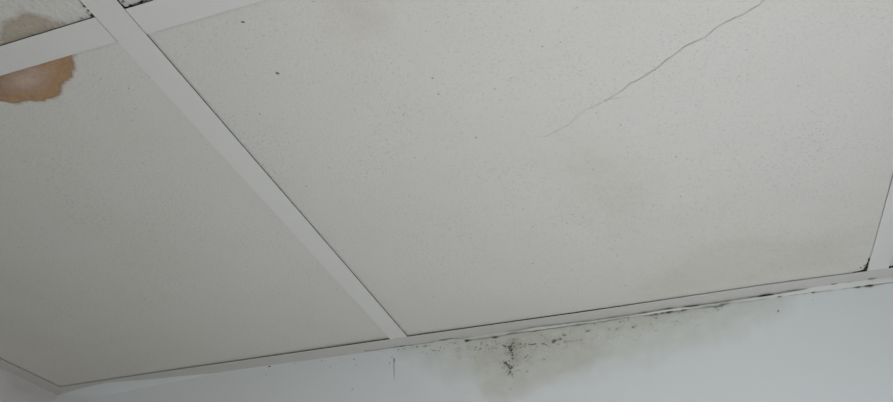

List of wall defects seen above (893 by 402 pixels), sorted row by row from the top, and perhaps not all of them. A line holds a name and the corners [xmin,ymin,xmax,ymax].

leakage [0,55,74,103]
crack [551,0,764,134]